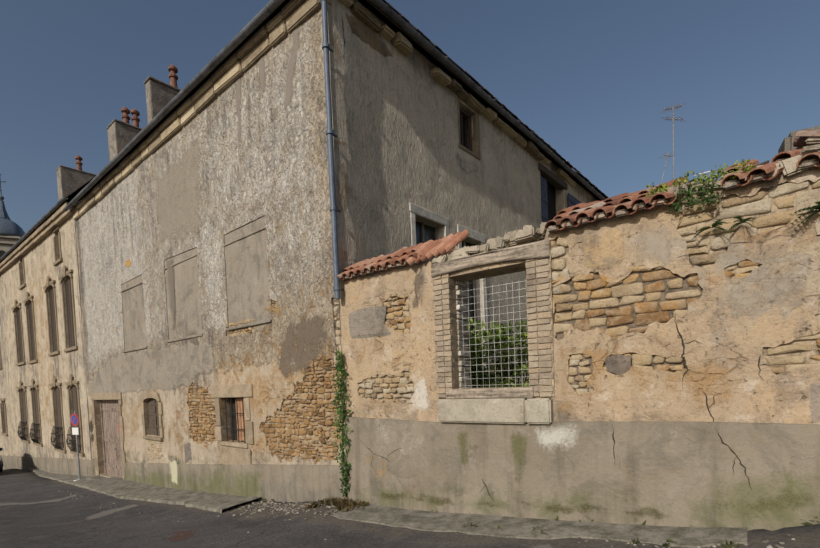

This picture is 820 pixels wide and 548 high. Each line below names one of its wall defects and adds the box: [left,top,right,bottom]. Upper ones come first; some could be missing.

spalling [550,179,820,340]
spalling [383,293,411,334]
spalling [188,383,216,447]
damp [280,316,326,378]
spalling [260,298,346,464]
spalling [358,361,414,410]
damp [539,429,568,445]
spalling [568,352,688,394]
crack [675,318,752,490]
spalling [761,332,820,375]